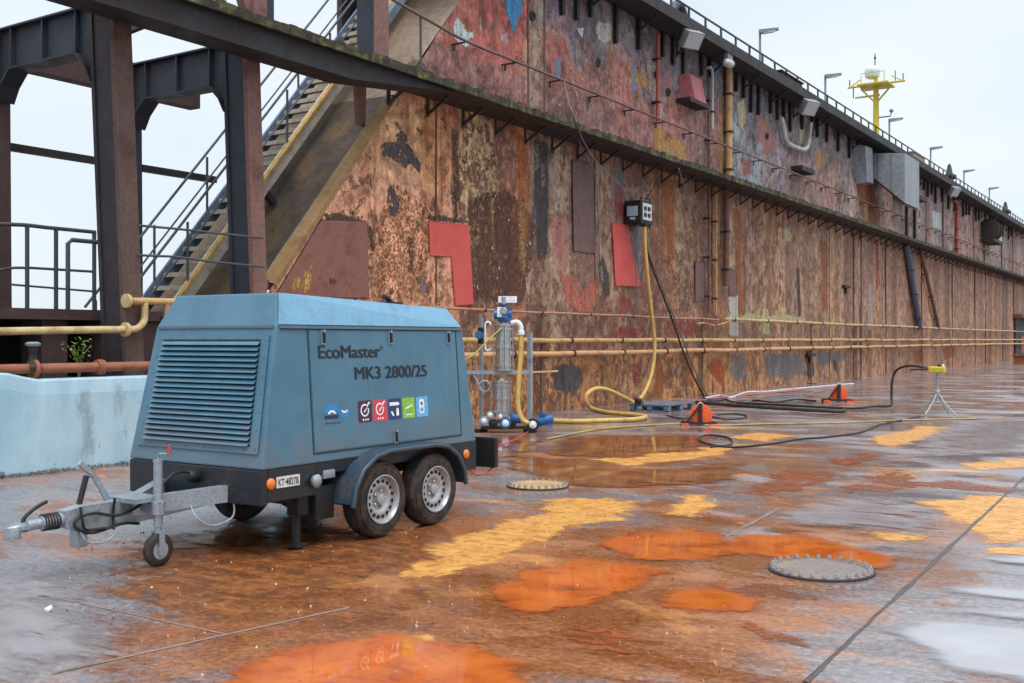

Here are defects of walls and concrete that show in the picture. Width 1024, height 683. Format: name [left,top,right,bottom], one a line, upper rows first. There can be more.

corrosion [645,44,665,118]
peeling [326,131,439,305]
corrosion [467,134,534,306]
corrosion [734,209,745,313]
corrosion [855,180,880,226]
corrosion [655,358,663,395]